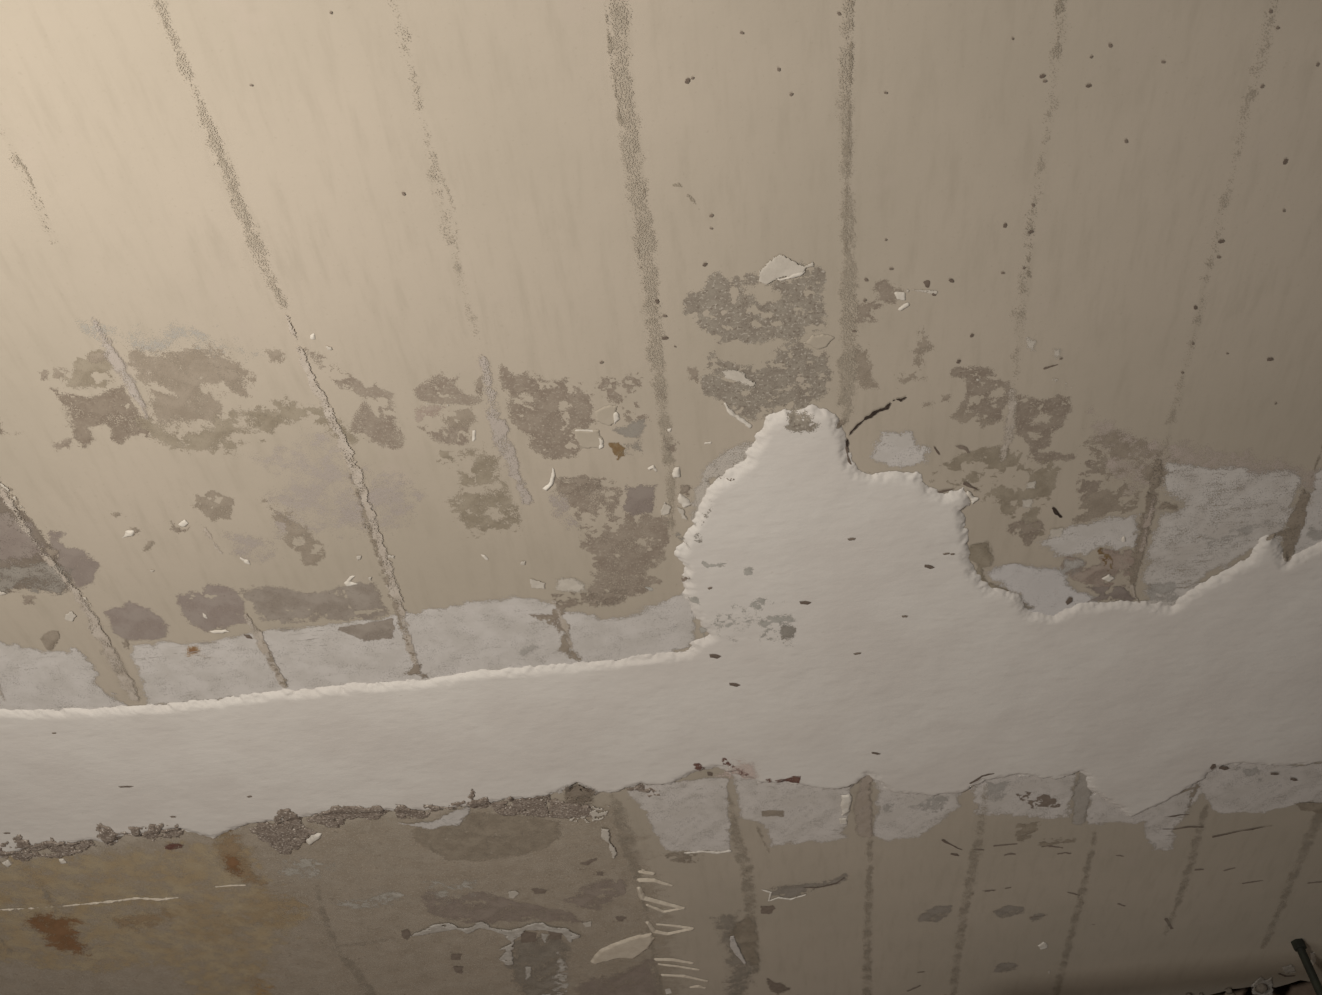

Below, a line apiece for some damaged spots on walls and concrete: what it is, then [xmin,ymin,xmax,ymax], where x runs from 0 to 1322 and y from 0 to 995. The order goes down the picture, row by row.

peeling [855,279,937,326]
peeling [683,255,835,428]
peeling [899,328,934,384]
crack [845,397,906,465]
peeling [922,348,1180,546]
peeling [0,333,691,661]
peeling [924,541,1033,610]
peeling [1060,536,1136,602]
spalling [626,784,660,797]
spalling [0,816,184,867]
spalling [249,785,628,927]